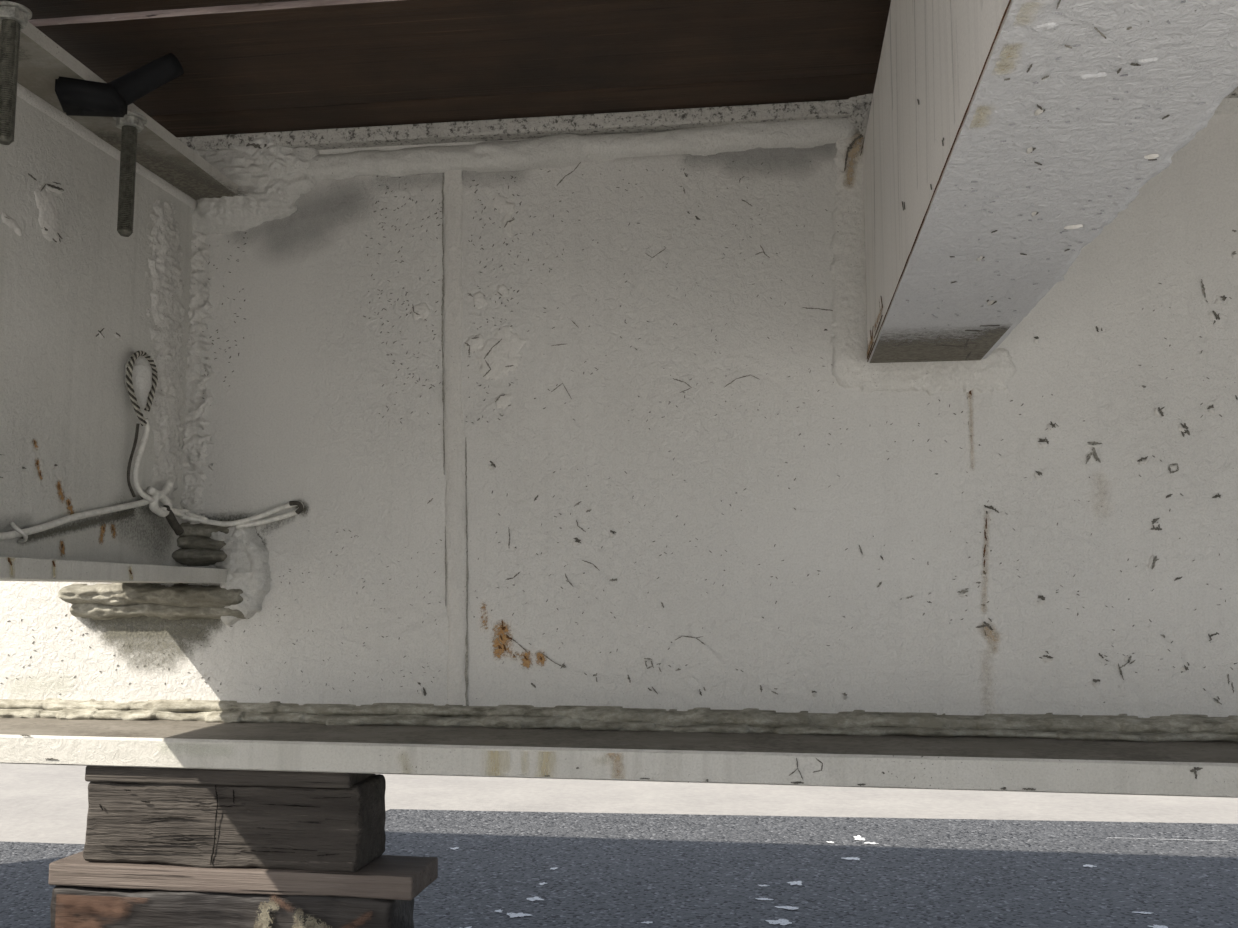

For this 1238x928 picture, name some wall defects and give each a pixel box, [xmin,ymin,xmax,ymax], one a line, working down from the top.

rust [867,297,883,359]
rust [57,481,74,515]
water stain [86,616,221,668]
rust [481,603,545,668]
rust [976,618,997,641]